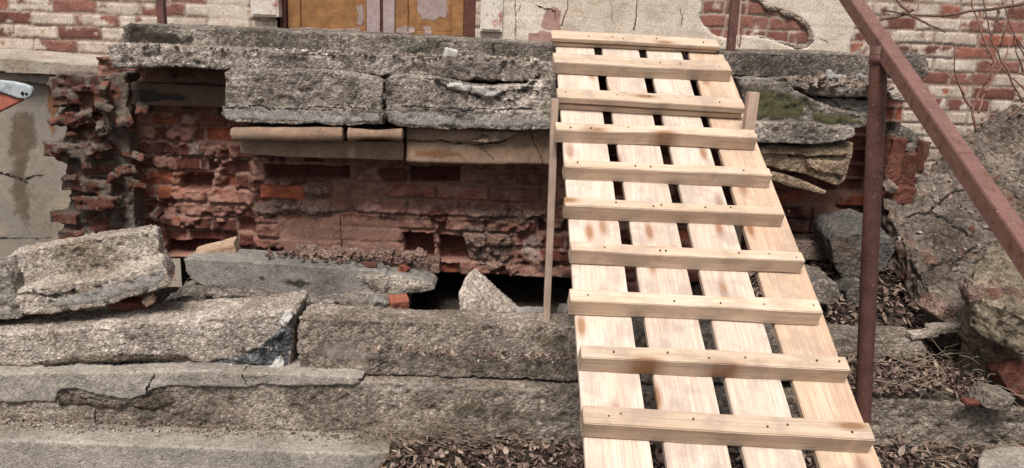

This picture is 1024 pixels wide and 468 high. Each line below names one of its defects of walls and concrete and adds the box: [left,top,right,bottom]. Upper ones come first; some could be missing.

peeling [396,0,448,35]
flaking render [699,0,814,49]
crack [223,74,543,163]
leakage [11,113,35,218]
crack [104,361,159,393]